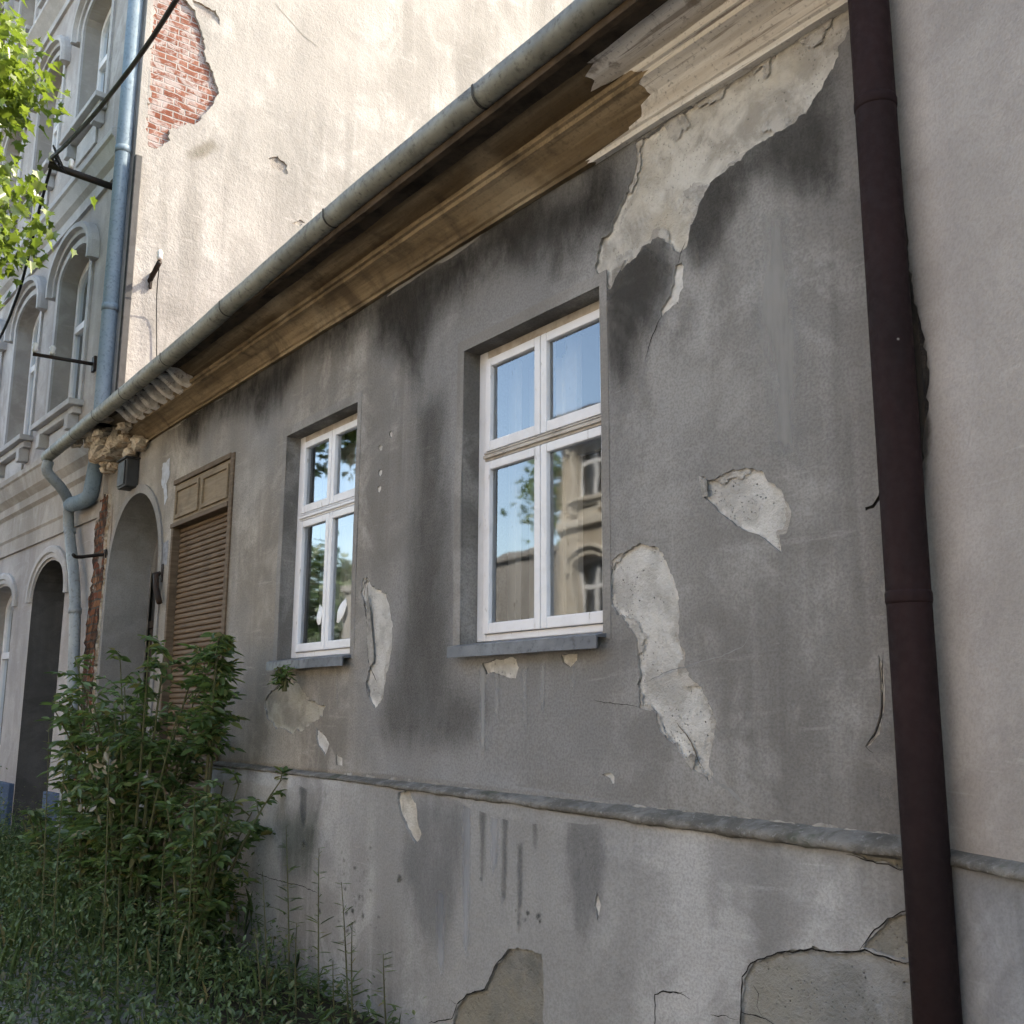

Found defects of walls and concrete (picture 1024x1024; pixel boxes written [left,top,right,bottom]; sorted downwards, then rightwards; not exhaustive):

flaking render [146,0,220,149]
flaking render [269,156,288,175]
peeling [585,0,850,319]
peeling [699,468,791,552]
flaking render [80,494,112,734]
peeling [360,577,393,709]
peeling [482,657,519,679]
peeling [611,543,716,782]
crack [865,660,884,753]
flaking render [389,777,422,844]
flaking render [453,948,544,1024]
flaking render [741,913,913,1024]